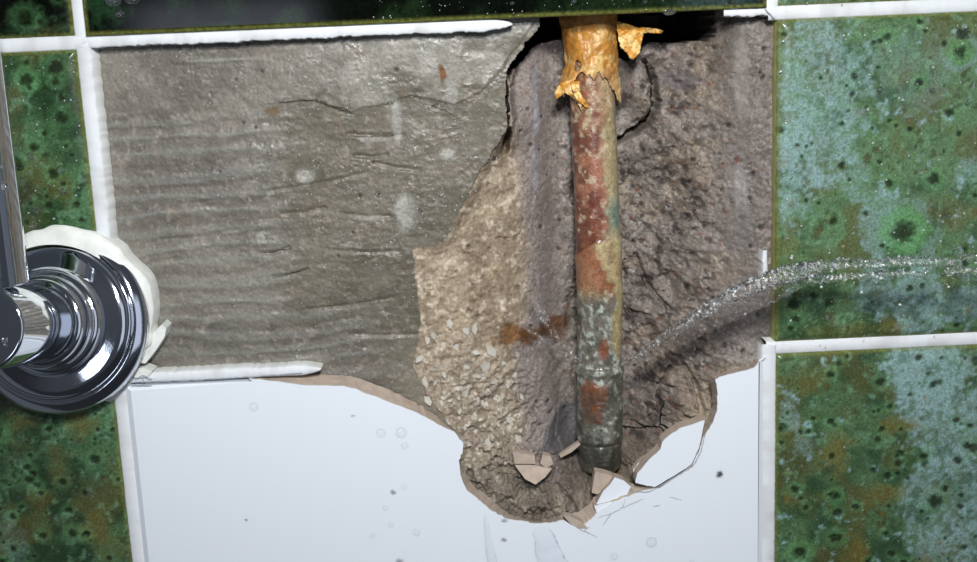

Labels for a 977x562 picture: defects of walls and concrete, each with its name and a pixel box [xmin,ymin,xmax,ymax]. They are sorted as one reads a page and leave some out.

crack [617,57,654,139]
spalling [412,17,596,521]
spalling [615,10,773,484]
peeling [132,319,172,378]
corrosion [492,316,567,345]